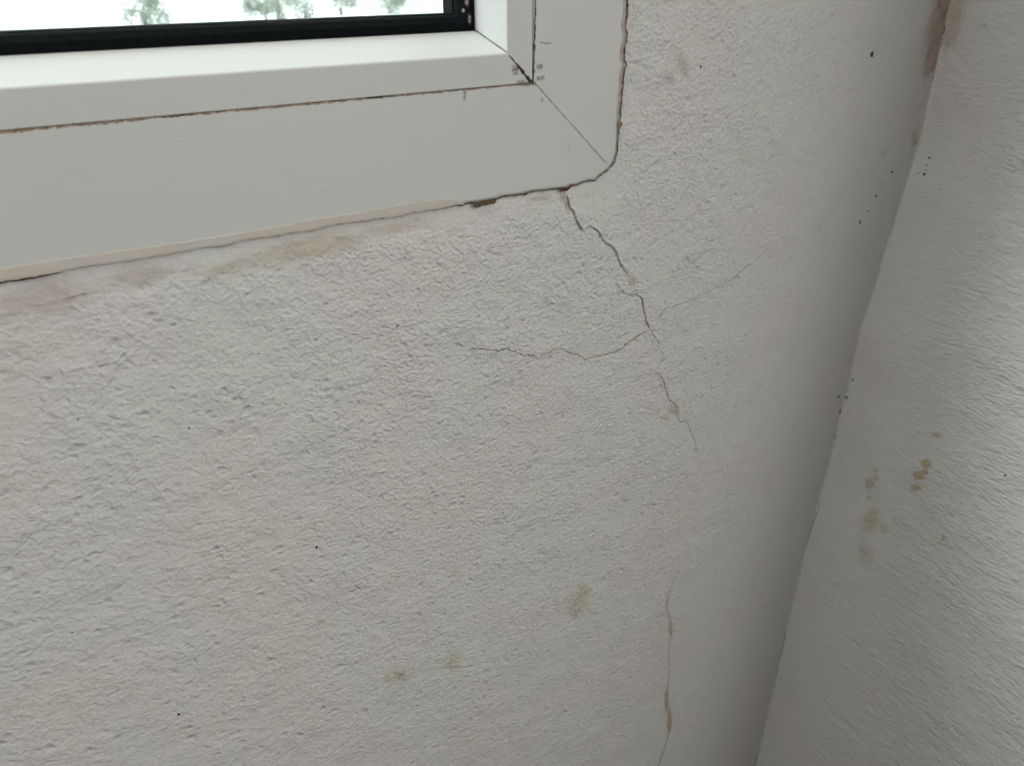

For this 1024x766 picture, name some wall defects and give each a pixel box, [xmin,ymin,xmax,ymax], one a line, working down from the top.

crack [0,0,769,448]
crack [658,570,680,766]